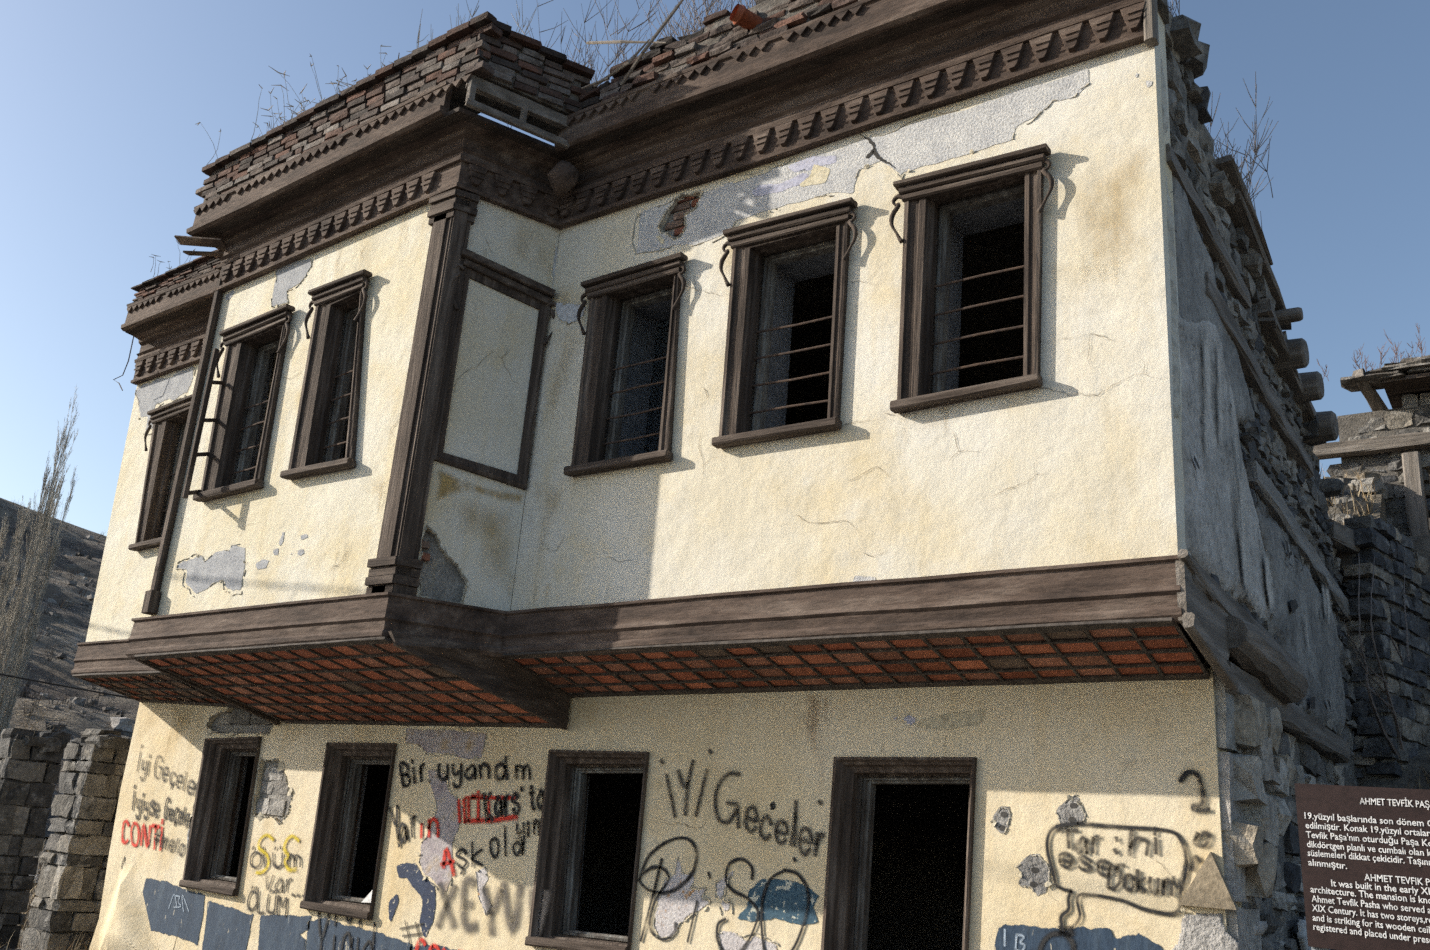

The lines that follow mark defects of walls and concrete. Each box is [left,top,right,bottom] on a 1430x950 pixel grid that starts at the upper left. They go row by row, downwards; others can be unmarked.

peeling [631,69,1090,255]
peeling [175,532,308,598]
flaking render [419,525,468,604]
flaking render [206,707,274,737]
flaking render [251,758,292,825]
flaking render [1016,854,1052,896]